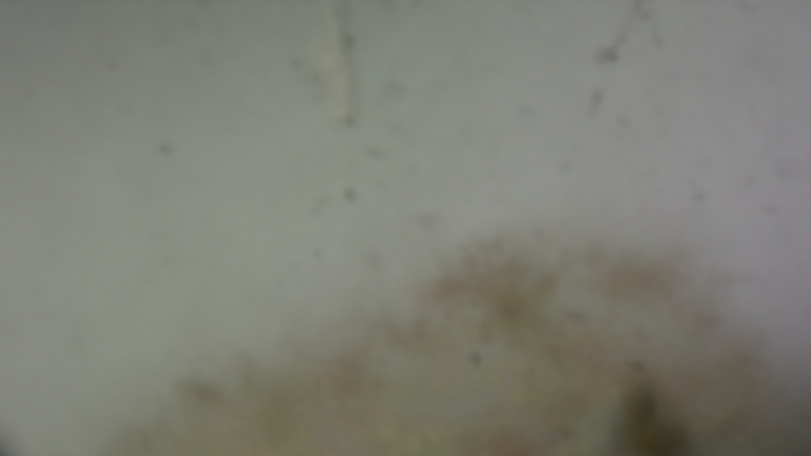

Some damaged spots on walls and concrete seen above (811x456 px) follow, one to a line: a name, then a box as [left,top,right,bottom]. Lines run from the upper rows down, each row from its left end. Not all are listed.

damp [171,314,790,456]